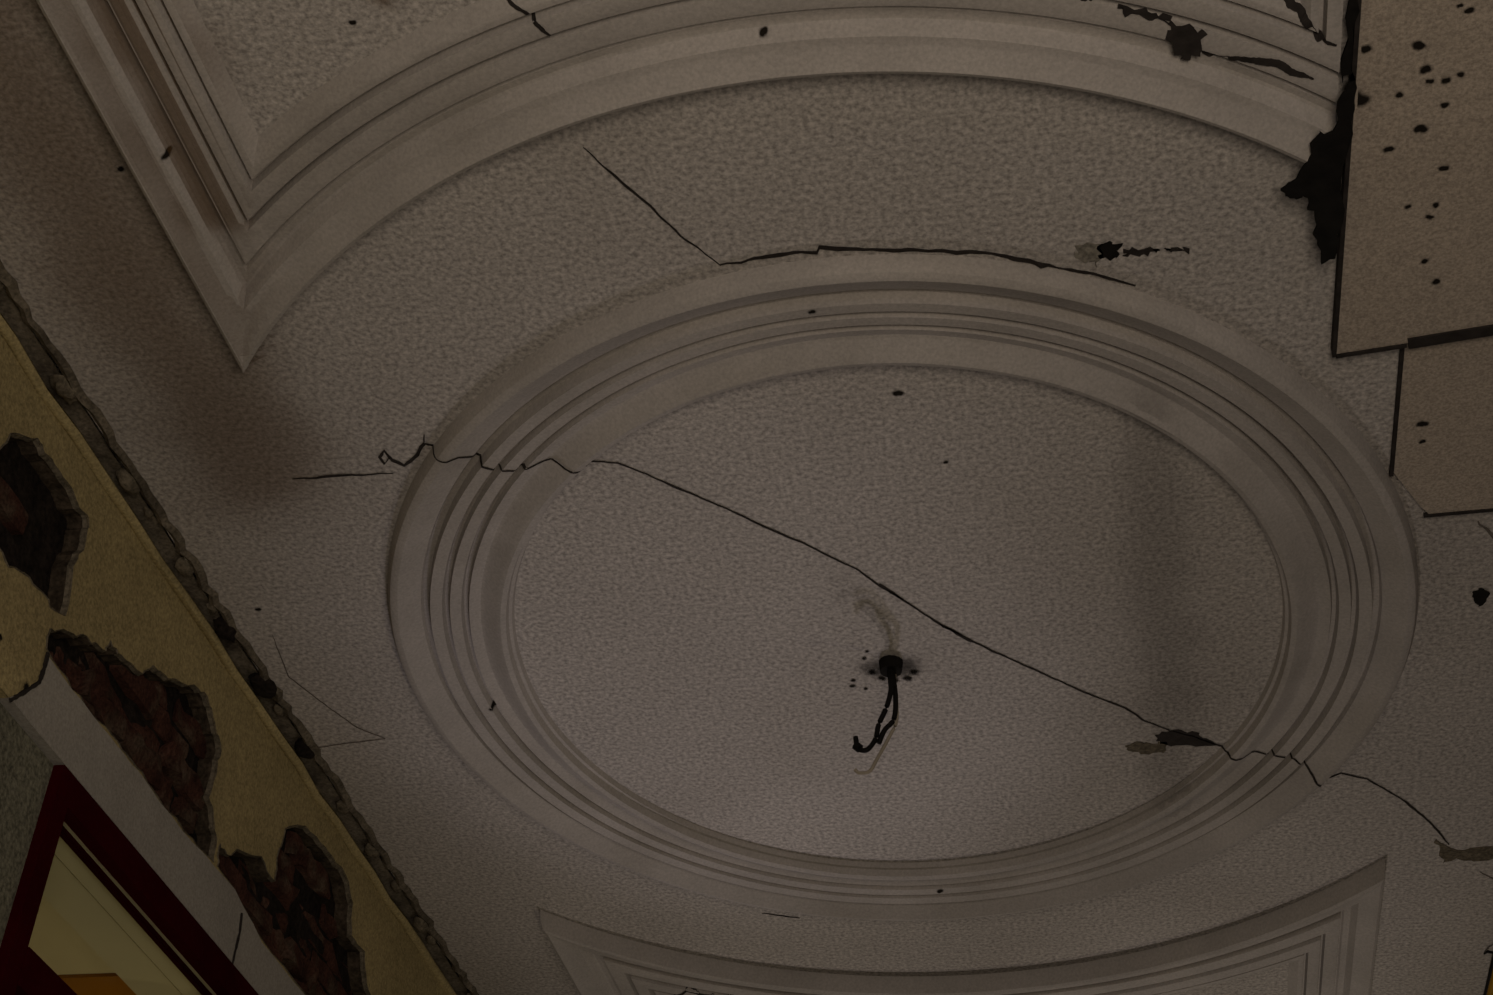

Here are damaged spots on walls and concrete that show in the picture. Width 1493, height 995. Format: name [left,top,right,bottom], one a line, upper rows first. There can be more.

crack [507,0,551,36]
crack [1201,0,1337,80]
spalling [1280,0,1360,264]
spalling [1074,241,1190,267]
crack [1477,521,1493,538]
spalling [0,260,479,995]
crack [292,435,1449,845]
crack [272,635,386,748]
crack [674,987,732,995]